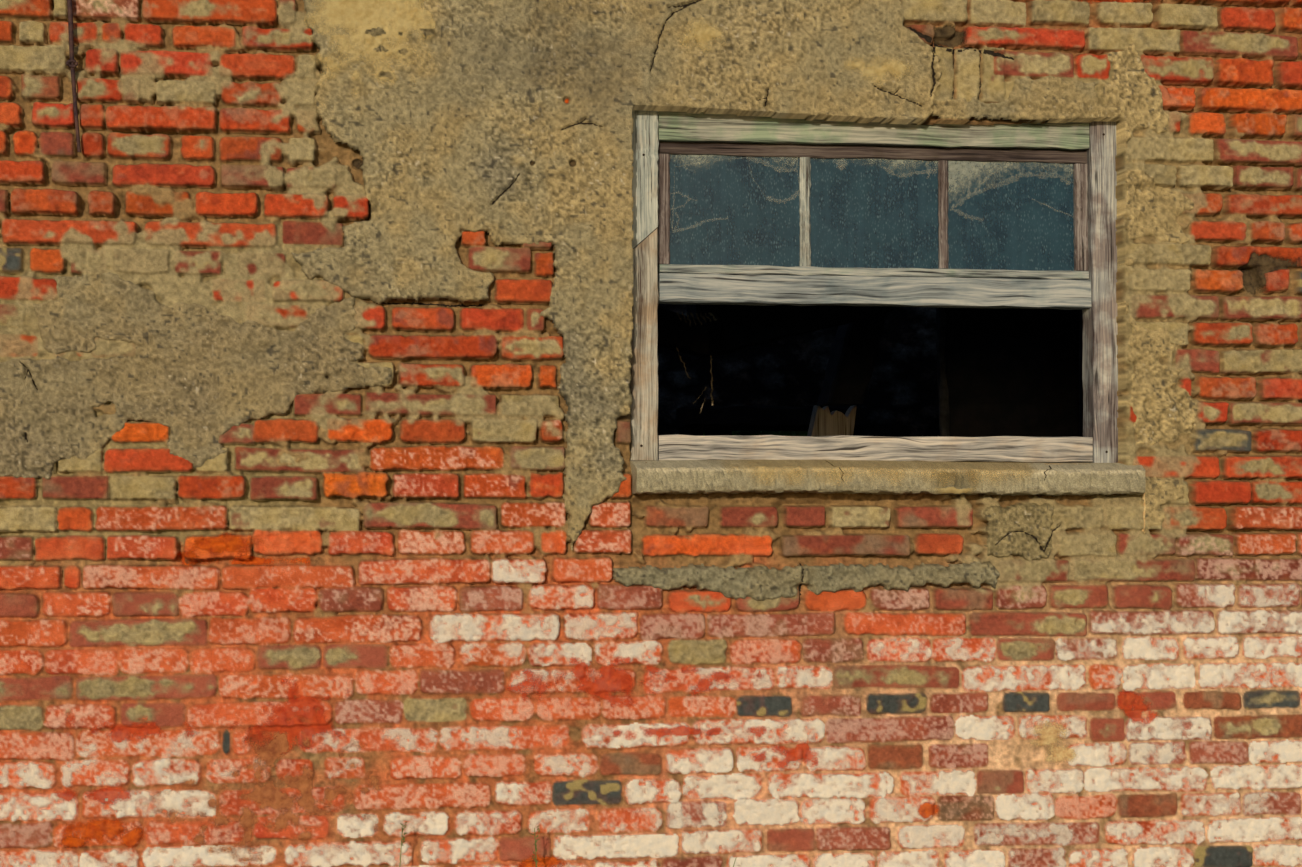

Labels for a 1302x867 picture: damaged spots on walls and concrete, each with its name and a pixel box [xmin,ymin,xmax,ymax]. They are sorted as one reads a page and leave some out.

crack [650,0,701,72]
crack [874,27,1014,106]
peeling [0,0,1169,550]
spalling [1238,252,1300,294]
peeling [1117,301,1198,445]
peeling [612,503,1054,601]
crack [995,524,1061,552]
water stain [233,679,347,755]
water stain [507,657,731,708]
water stain [613,725,726,740]
water stain [748,726,818,768]
water stain [1117,690,1157,724]